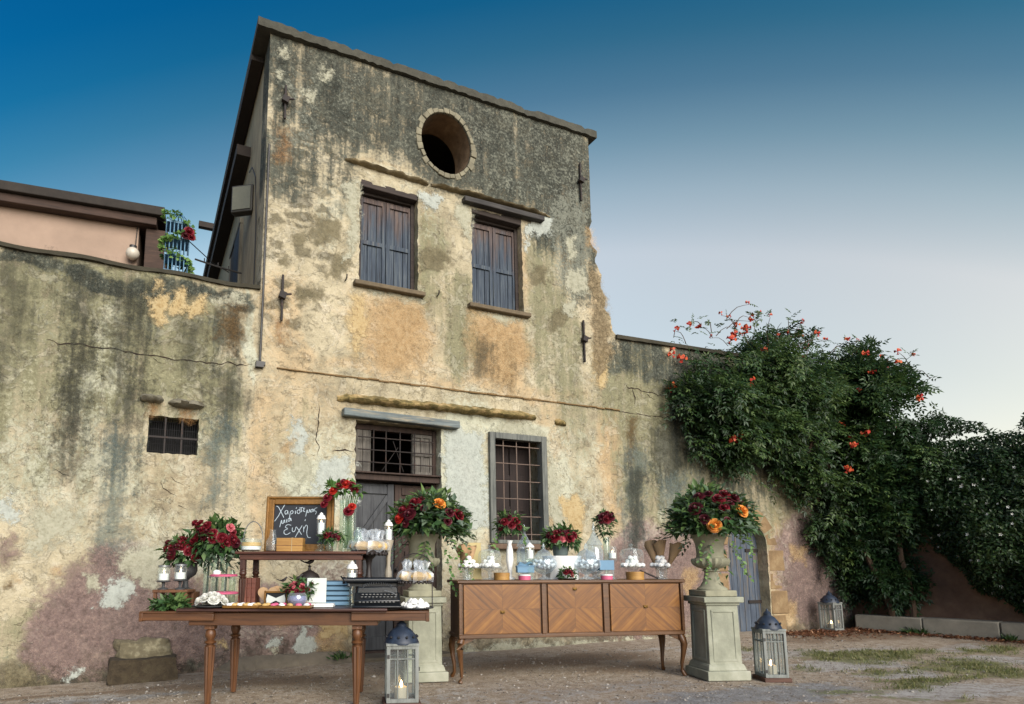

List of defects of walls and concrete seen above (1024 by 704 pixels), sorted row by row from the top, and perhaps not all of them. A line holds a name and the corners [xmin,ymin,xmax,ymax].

flaking render [454,203,473,238]
flaking render [524,217,553,252]
water stain [62,332,95,436]
water stain [111,282,148,471]
crack [47,339,252,366]
flaking render [550,236,615,388]
crack [615,385,674,420]
water stain [628,418,685,545]
flaking render [24,545,231,683]